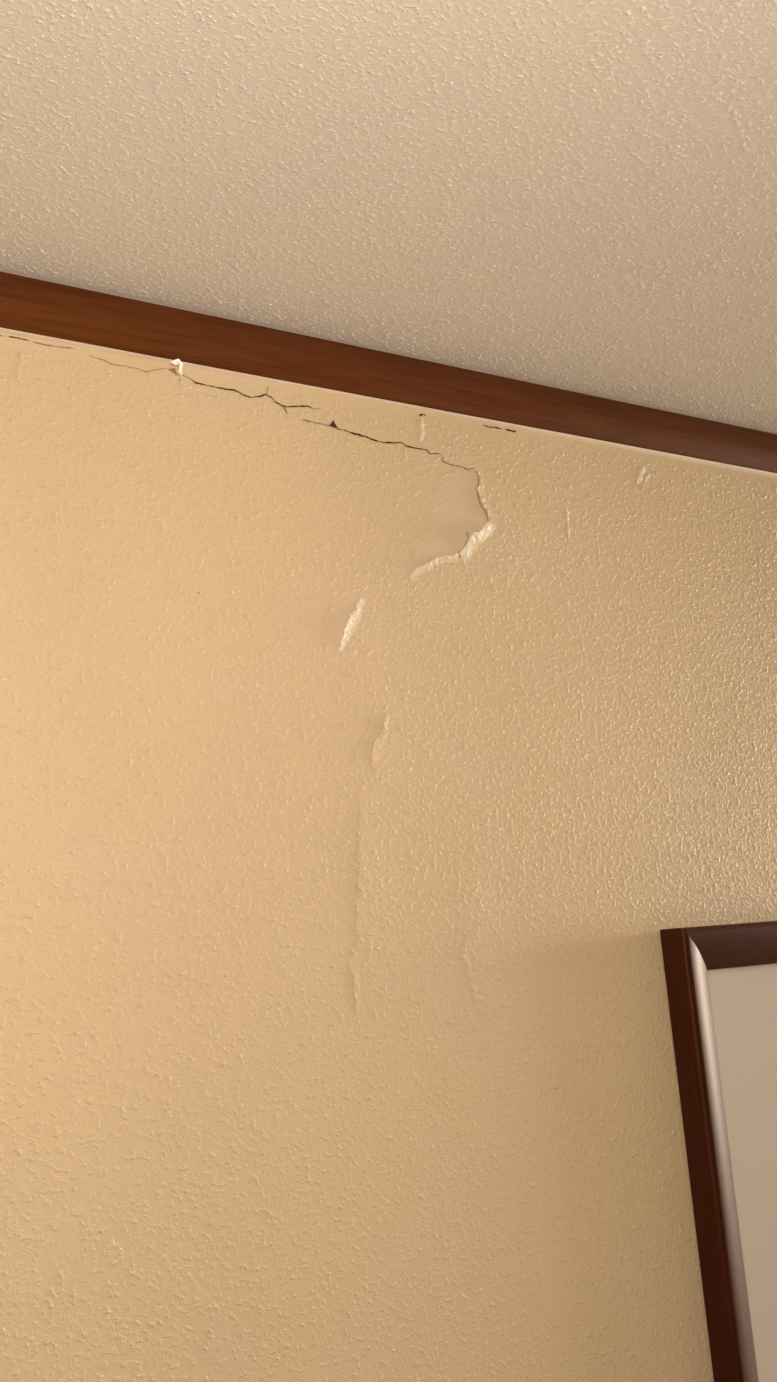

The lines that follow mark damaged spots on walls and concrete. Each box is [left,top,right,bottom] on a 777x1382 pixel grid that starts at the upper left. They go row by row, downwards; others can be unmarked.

crack [91,356,473,470]
peeling [409,466,500,582]